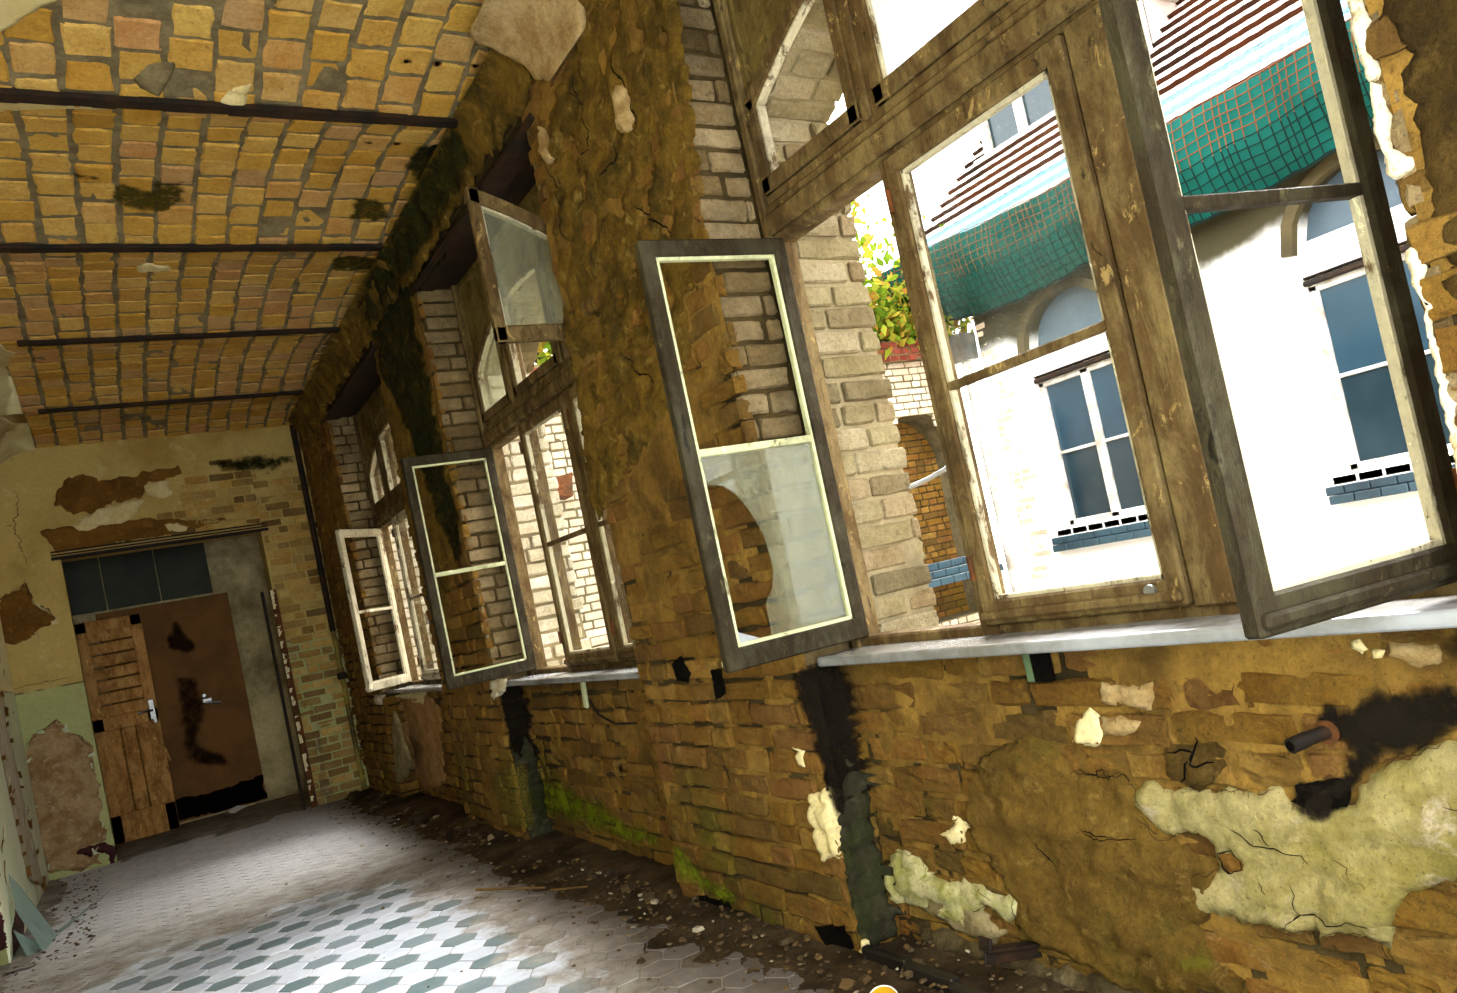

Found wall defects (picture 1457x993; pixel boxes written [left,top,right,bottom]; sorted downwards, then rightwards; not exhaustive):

water stain [113,181,184,211]
flaking render [0,0,489,448]
spalling [1379,0,1457,300]
spalling [40,465,233,553]
spalling [372,296,455,605]
spalling [0,583,59,647]
peeling [1350,638,1442,668]
spalling [0,690,107,891]
peeling [939,681,1249,993]
spalling [1292,778,1351,812]